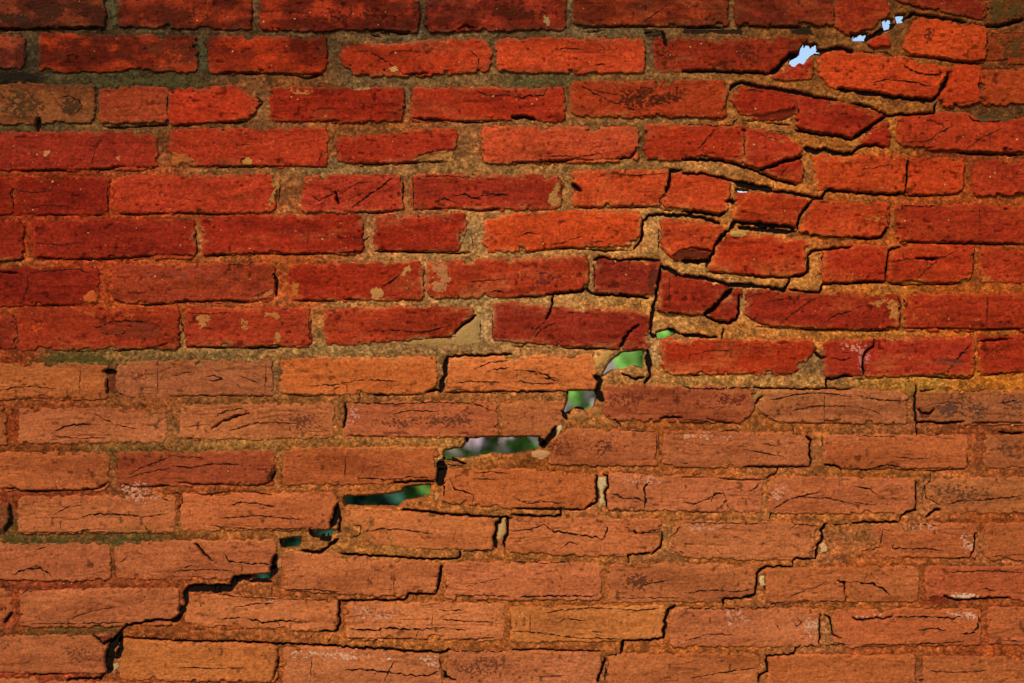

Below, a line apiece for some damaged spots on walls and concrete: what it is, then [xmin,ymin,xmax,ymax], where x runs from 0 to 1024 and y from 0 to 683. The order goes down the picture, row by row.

crack [641,3,669,47]
crack [229,262,279,297]
crack [312,13,1022,454]
crack [32,297,1023,682]